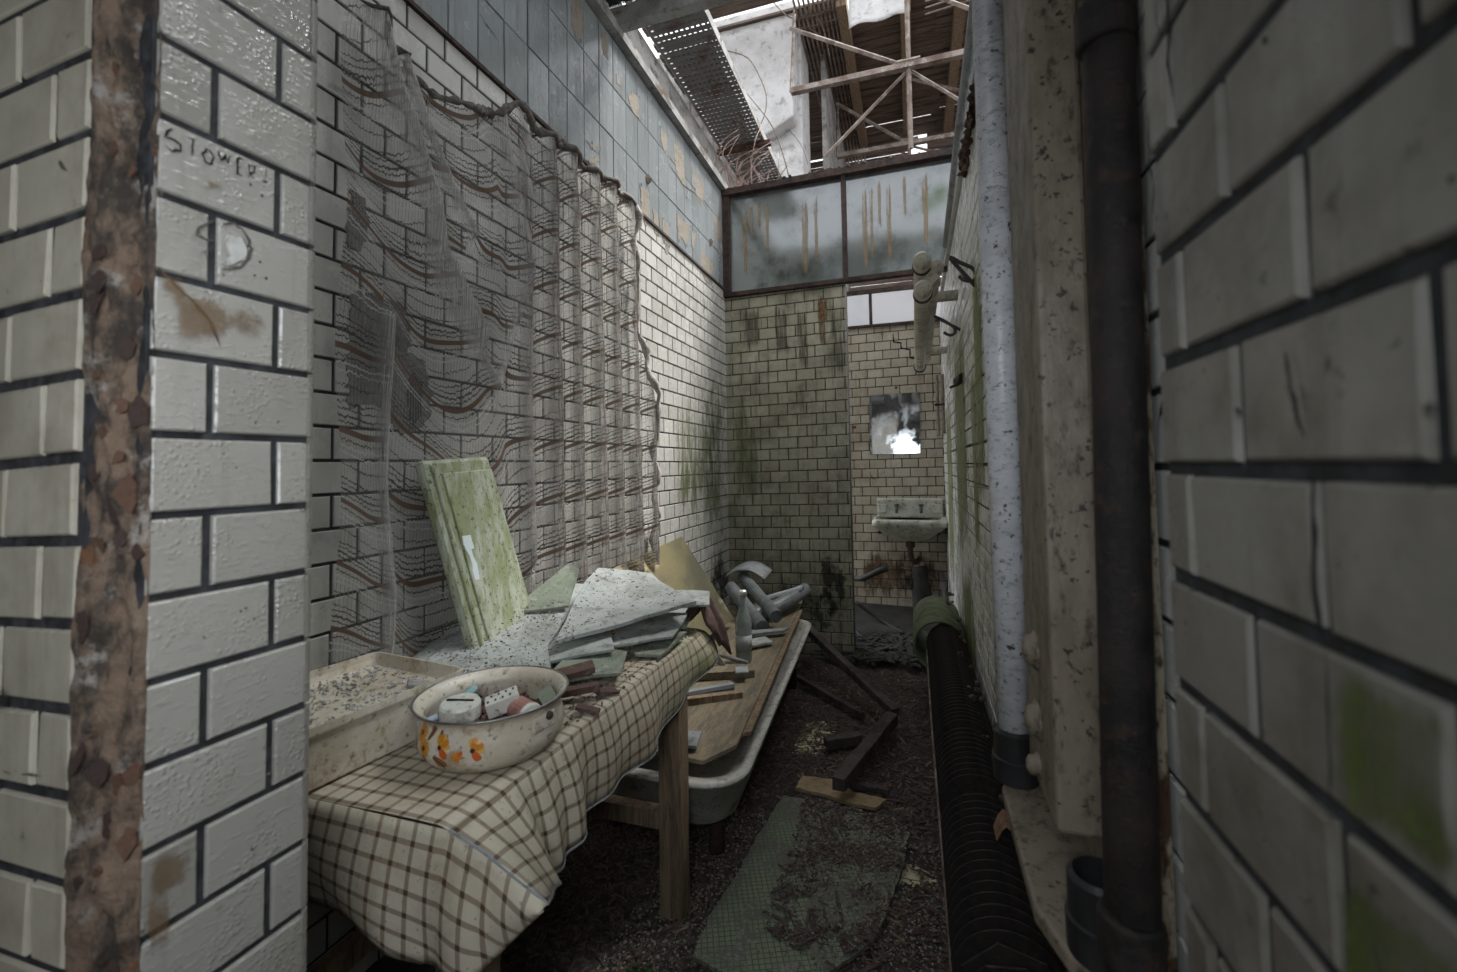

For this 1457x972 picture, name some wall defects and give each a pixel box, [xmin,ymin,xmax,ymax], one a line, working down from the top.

corrosion [728,83,976,188]
corrosion [802,201,818,273]
corrosion [862,175,928,267]
damp [743,309,808,364]
damp [970,371,979,560]